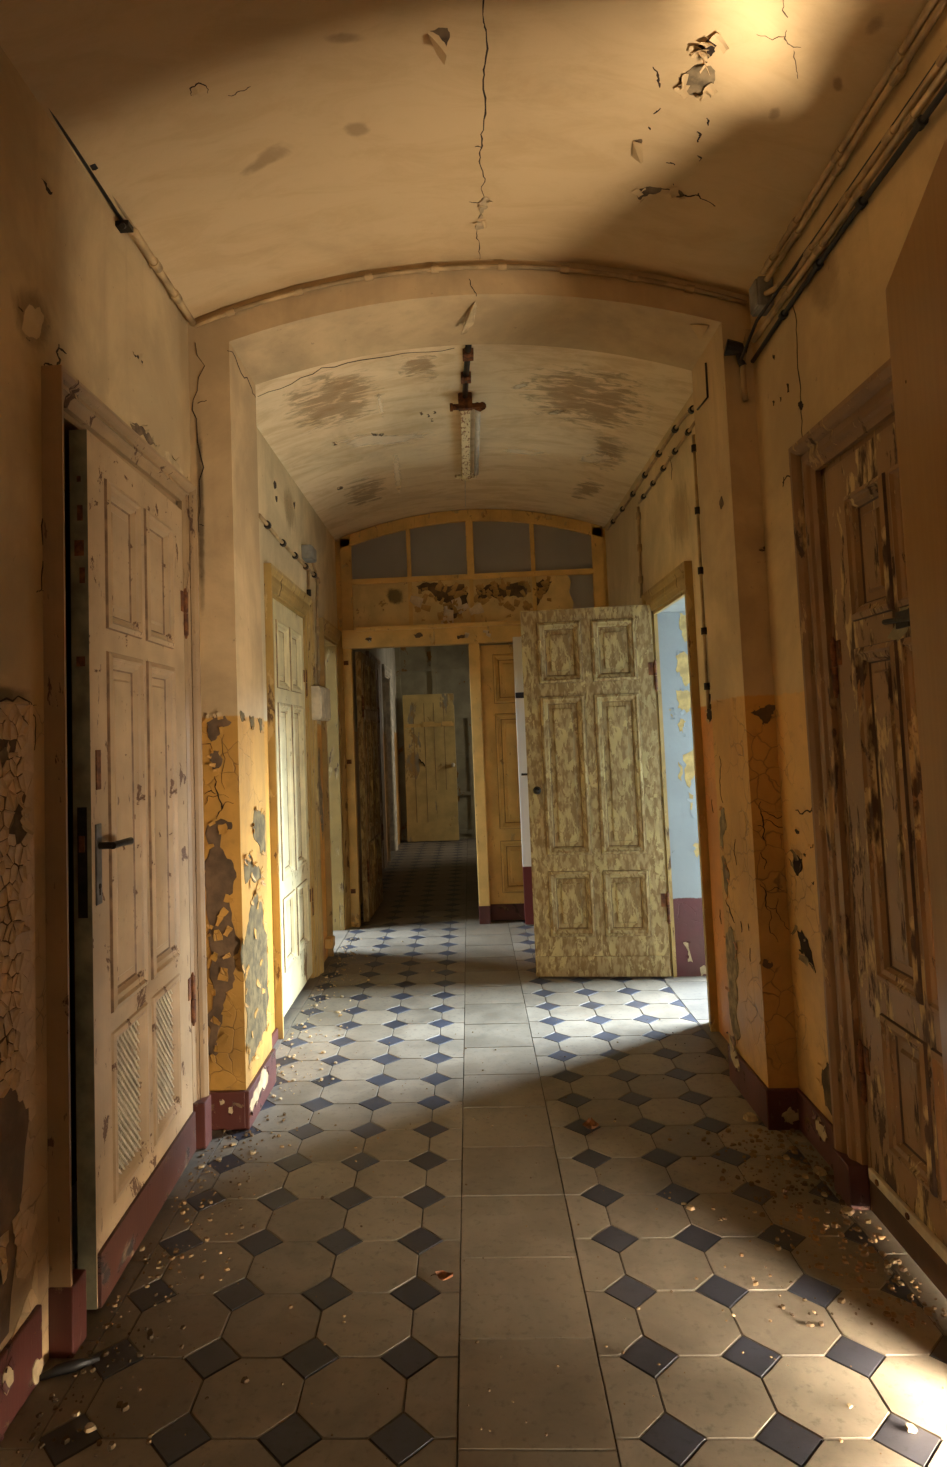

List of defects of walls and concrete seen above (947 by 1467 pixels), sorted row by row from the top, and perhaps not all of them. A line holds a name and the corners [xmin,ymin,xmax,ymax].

crack [648,67,661,130]
flaking render [674,33,729,102]
crack [469,0,489,296]
crack [661,118,715,207]
peeling [409,576,552,639]
peeling [203,711,265,772]
peeling [751,704,776,728]
flaking render [788,826,814,885]
peeling [204,805,270,1116]
flaking render [791,925,816,973]
peeling [0,703,43,1396]